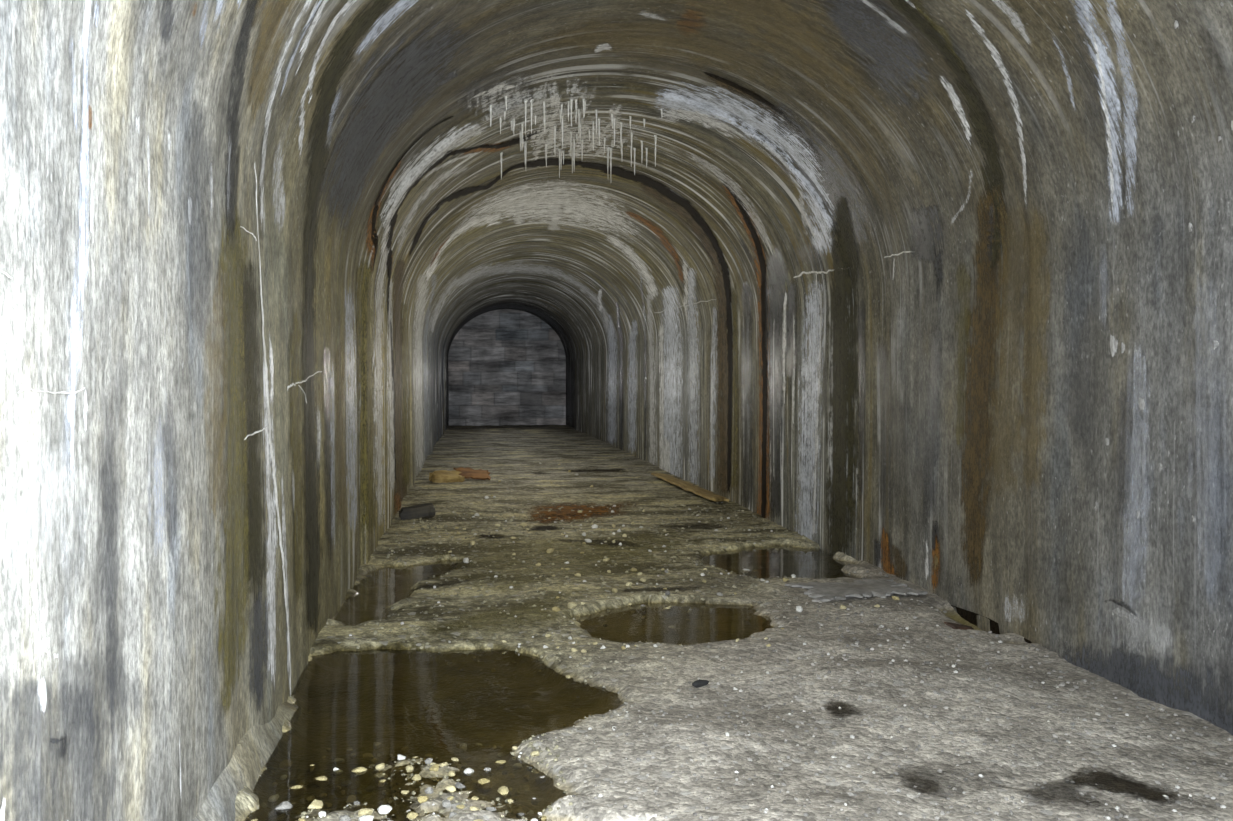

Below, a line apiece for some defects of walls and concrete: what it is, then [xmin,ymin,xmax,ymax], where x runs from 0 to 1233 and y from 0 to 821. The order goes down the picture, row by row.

water stain [161,0,172,39]
water stain [321,0,471,230]
water stain [1074,0,1137,222]
water stain [68,0,99,470]
water stain [317,74,639,559]
crack [366,116,849,519]
water stain [39,678,47,711]
water stain [50,737,67,755]
water stain [103,405,118,654]
water stain [416,580,470,590]
rust [874,527,907,579]
rust [925,521,940,589]